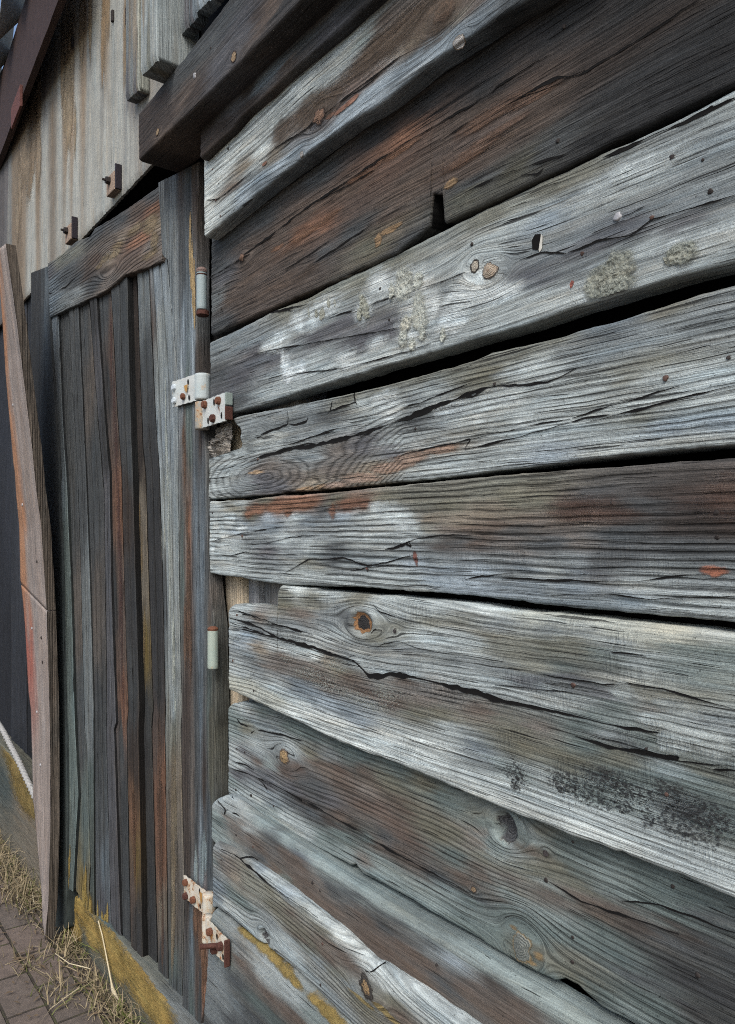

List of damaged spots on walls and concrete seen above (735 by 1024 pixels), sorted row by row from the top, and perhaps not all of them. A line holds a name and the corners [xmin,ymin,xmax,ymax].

crack [208,368,576,479]
crack [363,385,735,464]
corrosion [700,566,728,577]
crack [230,607,735,771]
mould [502,754,532,793]
mould [546,761,735,853]
corrosion [193,892,213,1005]